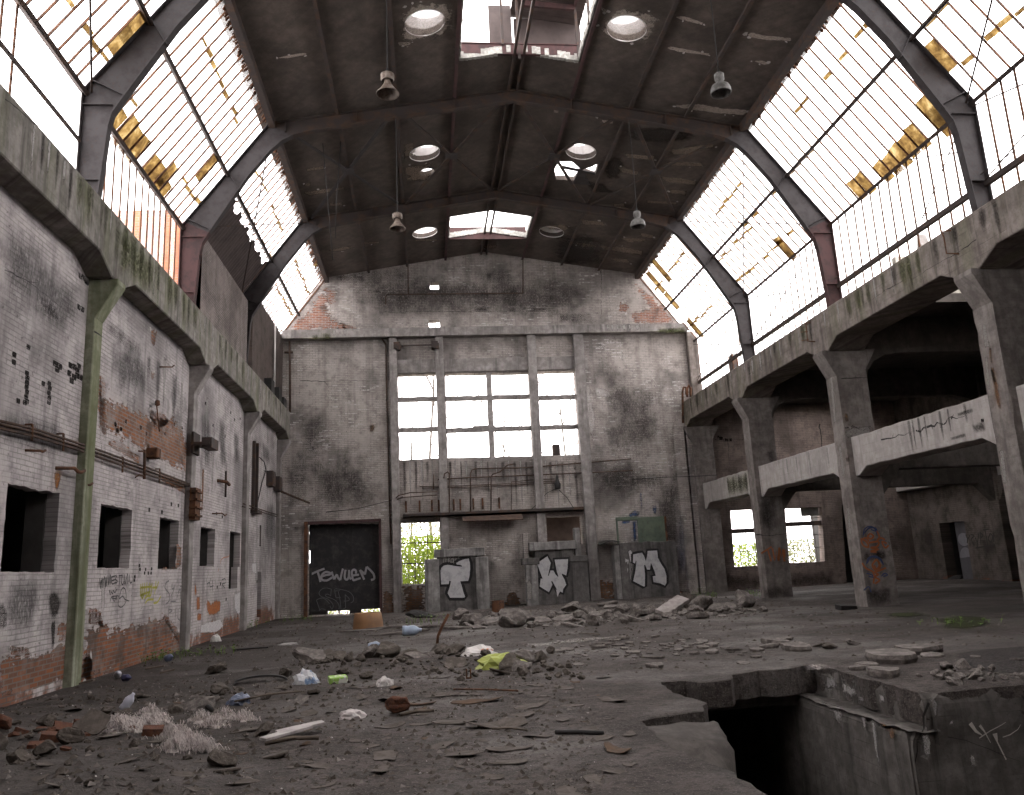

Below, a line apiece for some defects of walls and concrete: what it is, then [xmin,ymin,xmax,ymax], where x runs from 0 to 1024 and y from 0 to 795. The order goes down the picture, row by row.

damp [31,124,72,198]
damp [87,188,160,293]
peeling [292,283,360,330]
peeling [617,283,673,324]
damp [119,348,183,426]
peeling [98,375,187,514]
peeling [0,620,67,696]
peeling [81,607,179,682]